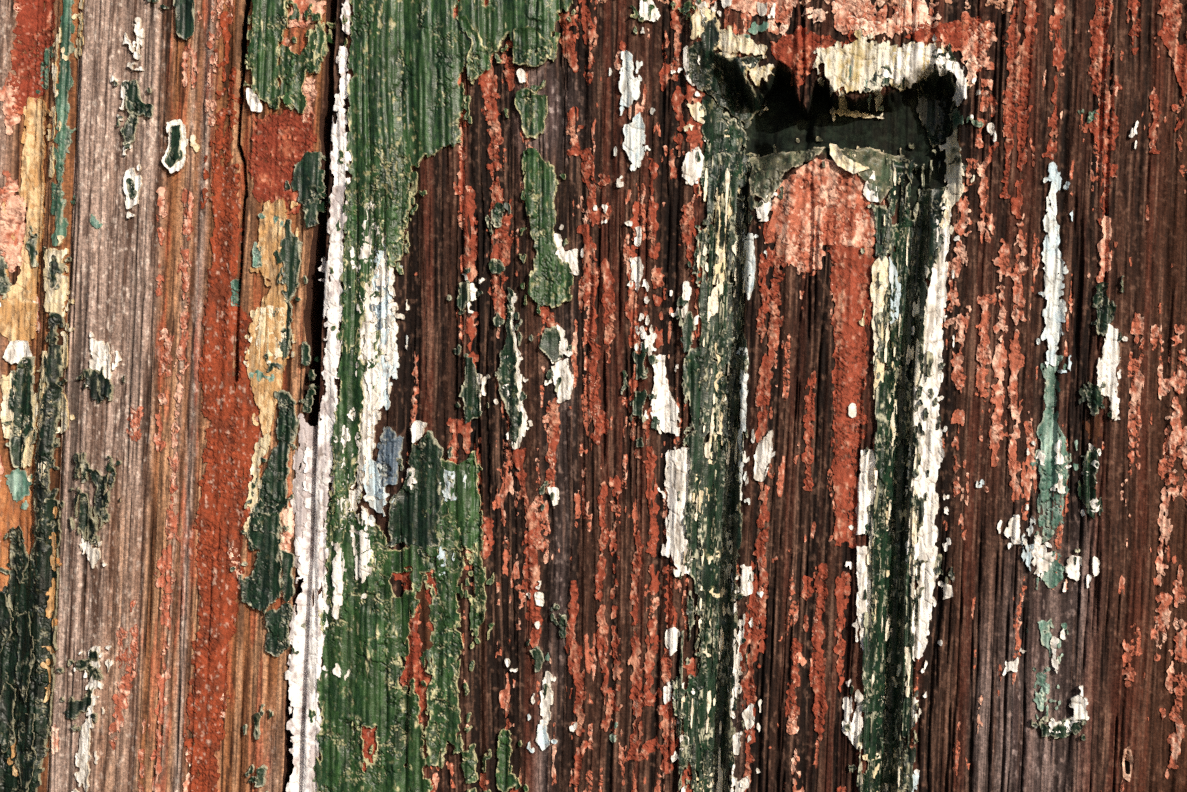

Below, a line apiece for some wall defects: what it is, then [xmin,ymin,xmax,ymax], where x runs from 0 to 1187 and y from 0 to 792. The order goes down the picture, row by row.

peeling [0,0,56,136]
peeling [110,17,154,155]
crack [233,0,251,307]
peeling [0,170,139,792]
peeling [123,0,1071,792]
peeling [1026,618,1089,741]
peeling [1062,548,1100,592]
peeling [1077,0,1187,769]